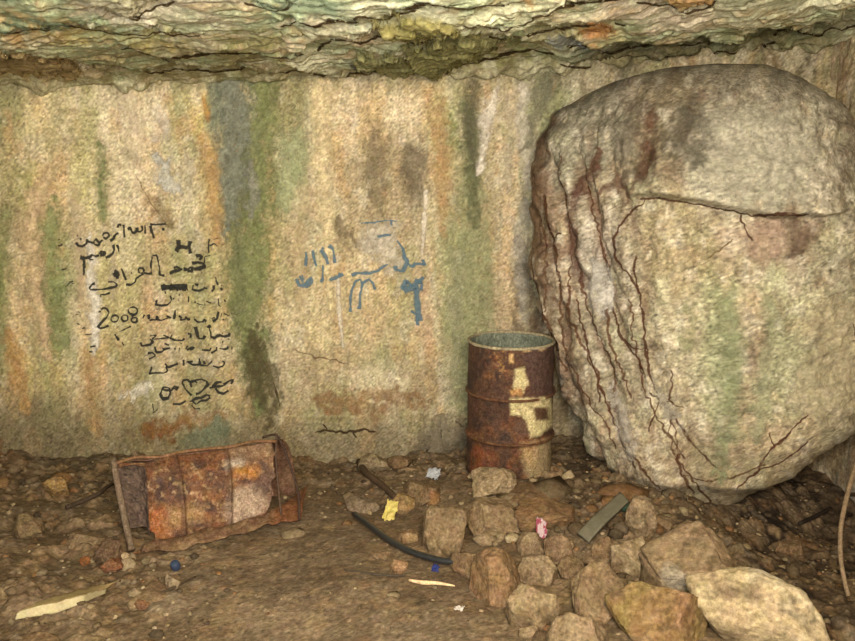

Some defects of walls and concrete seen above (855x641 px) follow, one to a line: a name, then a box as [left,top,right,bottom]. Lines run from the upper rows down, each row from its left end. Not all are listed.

crack [0,0,716,78]
crack [679,25,855,55]
leakage [211,80,259,320]
leakage [244,323,282,430]
crack [315,424,376,438]